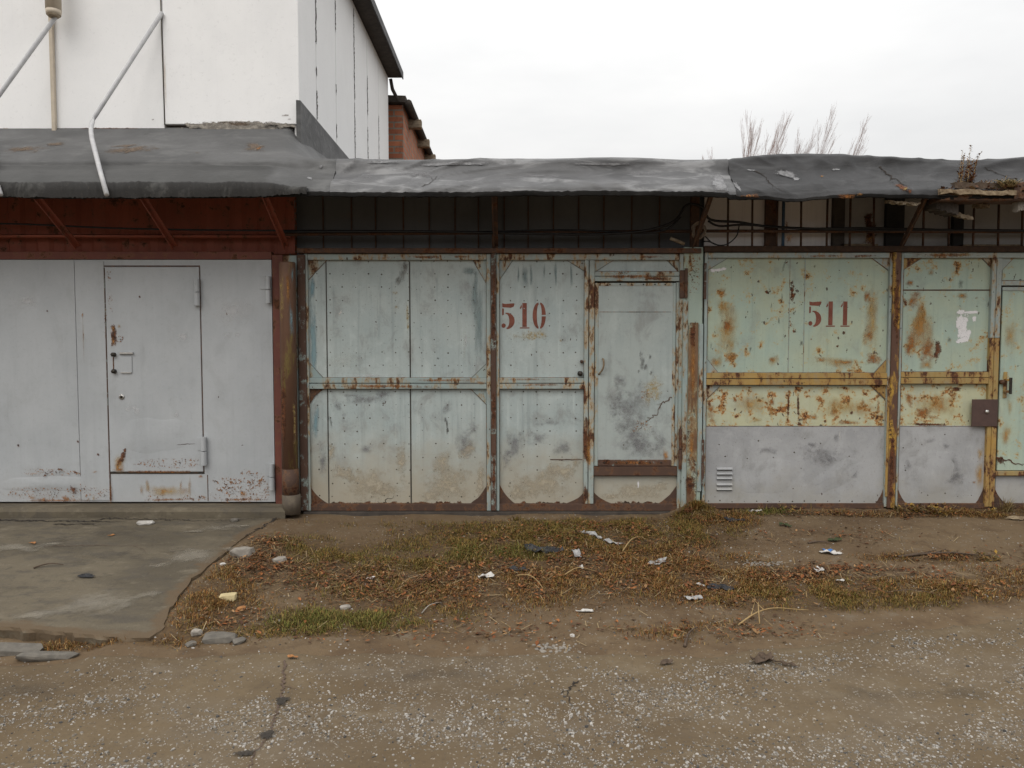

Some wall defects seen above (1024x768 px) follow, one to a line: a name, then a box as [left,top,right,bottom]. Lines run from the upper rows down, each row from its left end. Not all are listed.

corrosion [713,291,733,373]
corrosion [893,271,950,366]
peeling [956,310,978,343]
corrosion [787,391,864,425]
corrosion [907,387,961,426]
corrosion [8,468,112,503]
corrosion [117,449,269,503]